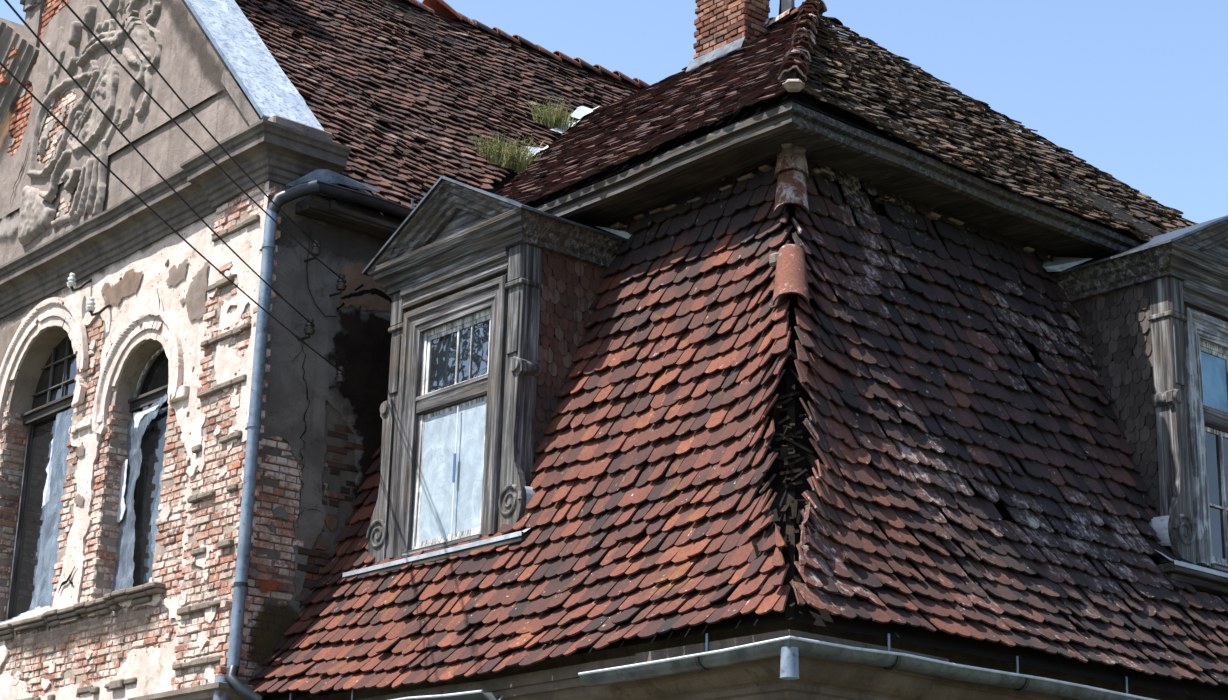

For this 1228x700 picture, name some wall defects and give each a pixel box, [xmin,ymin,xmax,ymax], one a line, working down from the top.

flaking render [0,0,70,157]
flaking render [37,84,77,165]
flaking render [2,183,364,697]
crack [292,335,322,541]
damp [326,306,392,504]